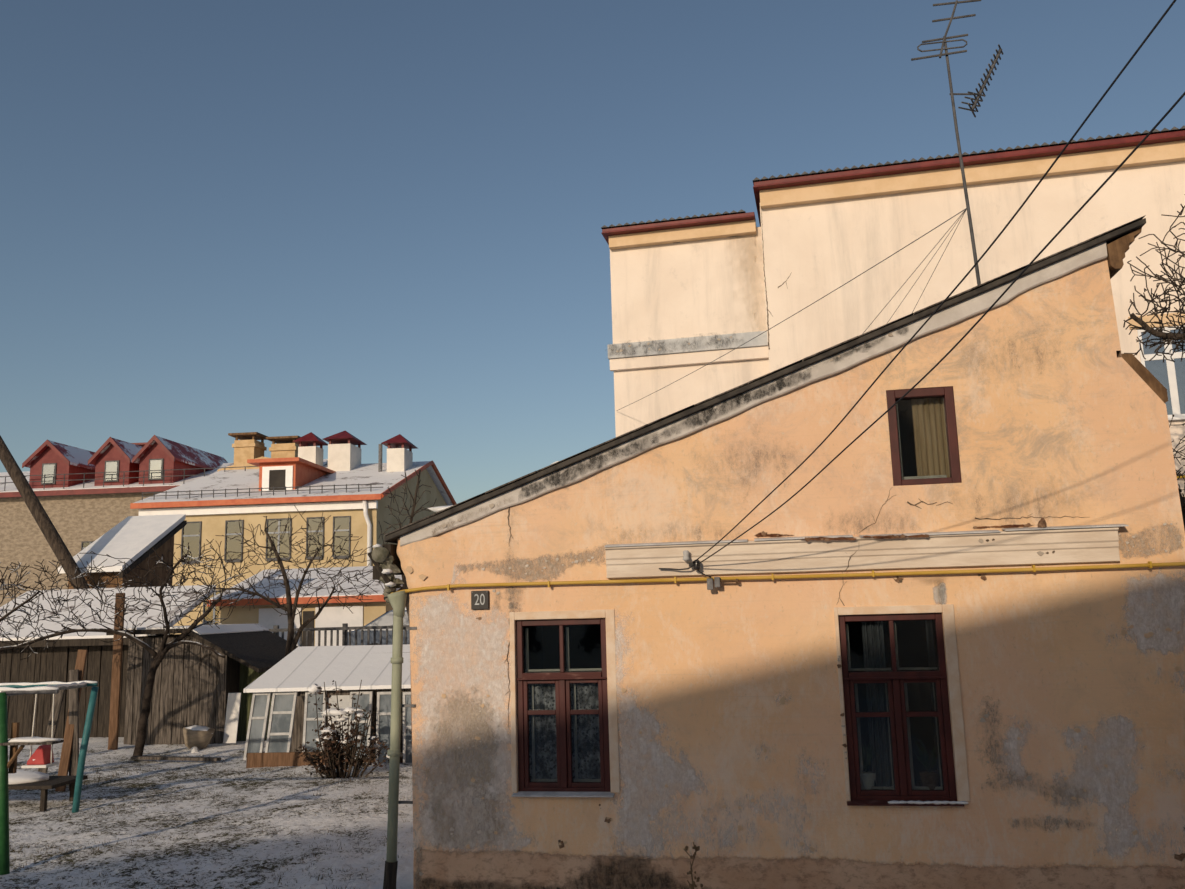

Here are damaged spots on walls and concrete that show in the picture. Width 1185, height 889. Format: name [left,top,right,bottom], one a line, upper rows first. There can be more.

crack [838,490,1084,606]
spalling [1118,523,1181,557]
damp [418,878,560,889]
damp [575,858,703,889]